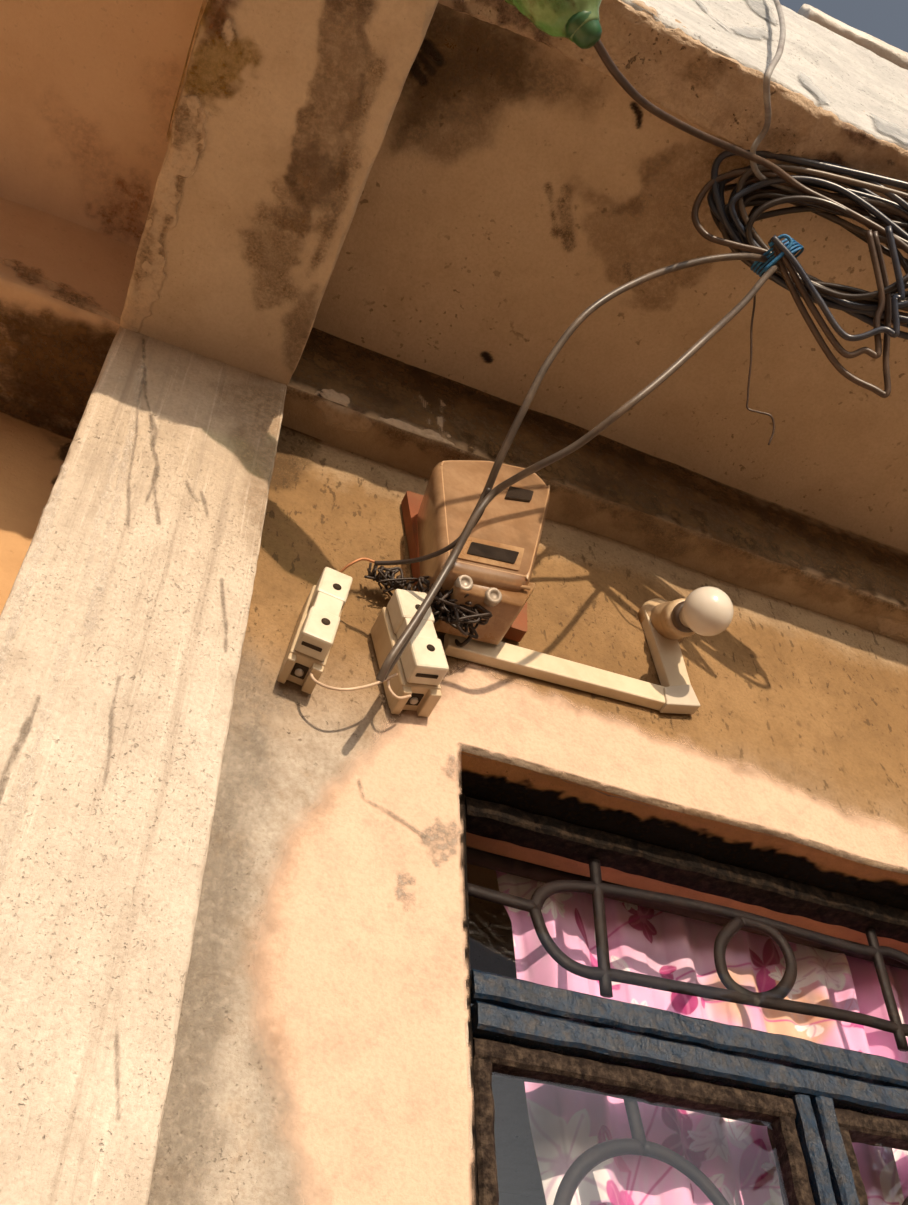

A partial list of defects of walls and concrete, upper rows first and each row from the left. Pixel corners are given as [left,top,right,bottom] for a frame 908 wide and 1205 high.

leakage [167,0,259,135]
leakage [0,311,116,439]
flaking render [5,96,206,332]
leakage [247,0,908,636]